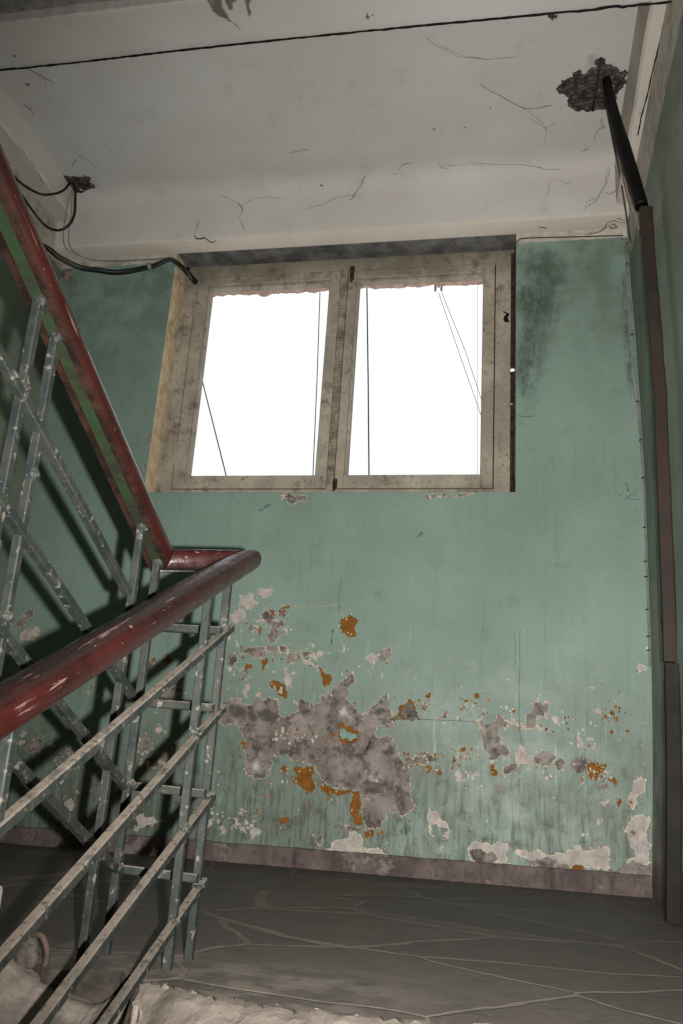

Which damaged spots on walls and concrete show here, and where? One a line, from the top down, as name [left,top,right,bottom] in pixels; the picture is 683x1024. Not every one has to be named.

crack [0,1,672,136]
spalling [556,57,628,112]
flaking render [207,585,652,876]